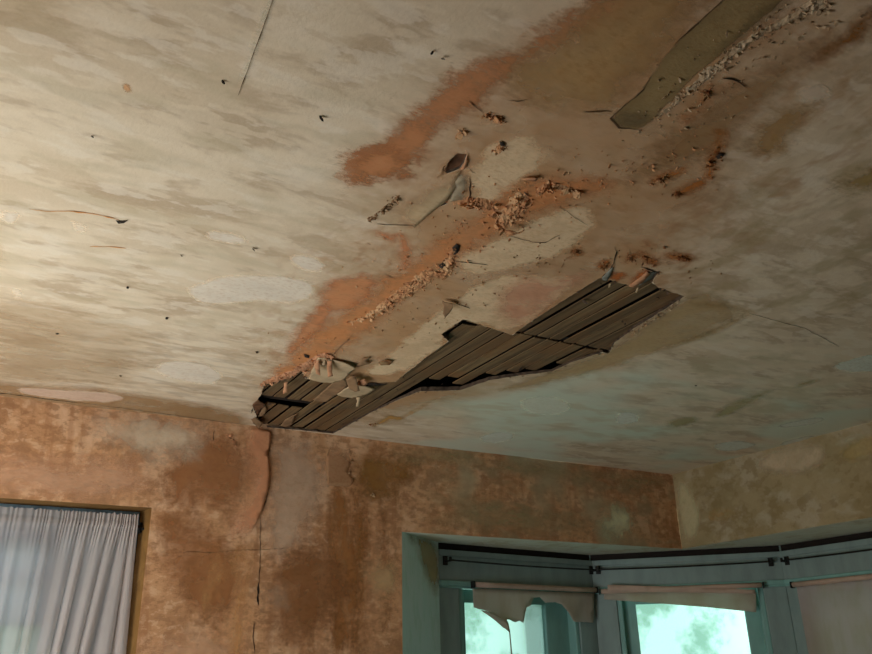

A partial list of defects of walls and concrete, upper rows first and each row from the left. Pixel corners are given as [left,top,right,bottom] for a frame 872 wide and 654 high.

spalling [655,0,832,121]
spalling [408,153,583,237]
water stain [419,26,788,335]
spalling [260,352,334,394]
peeling [356,357,393,367]
water stain [329,265,469,383]
spalling [350,244,460,326]
water stain [383,391,454,408]
water stain [168,438,245,503]
water stain [163,517,240,612]
crack [187,486,283,604]
water stain [275,490,366,648]